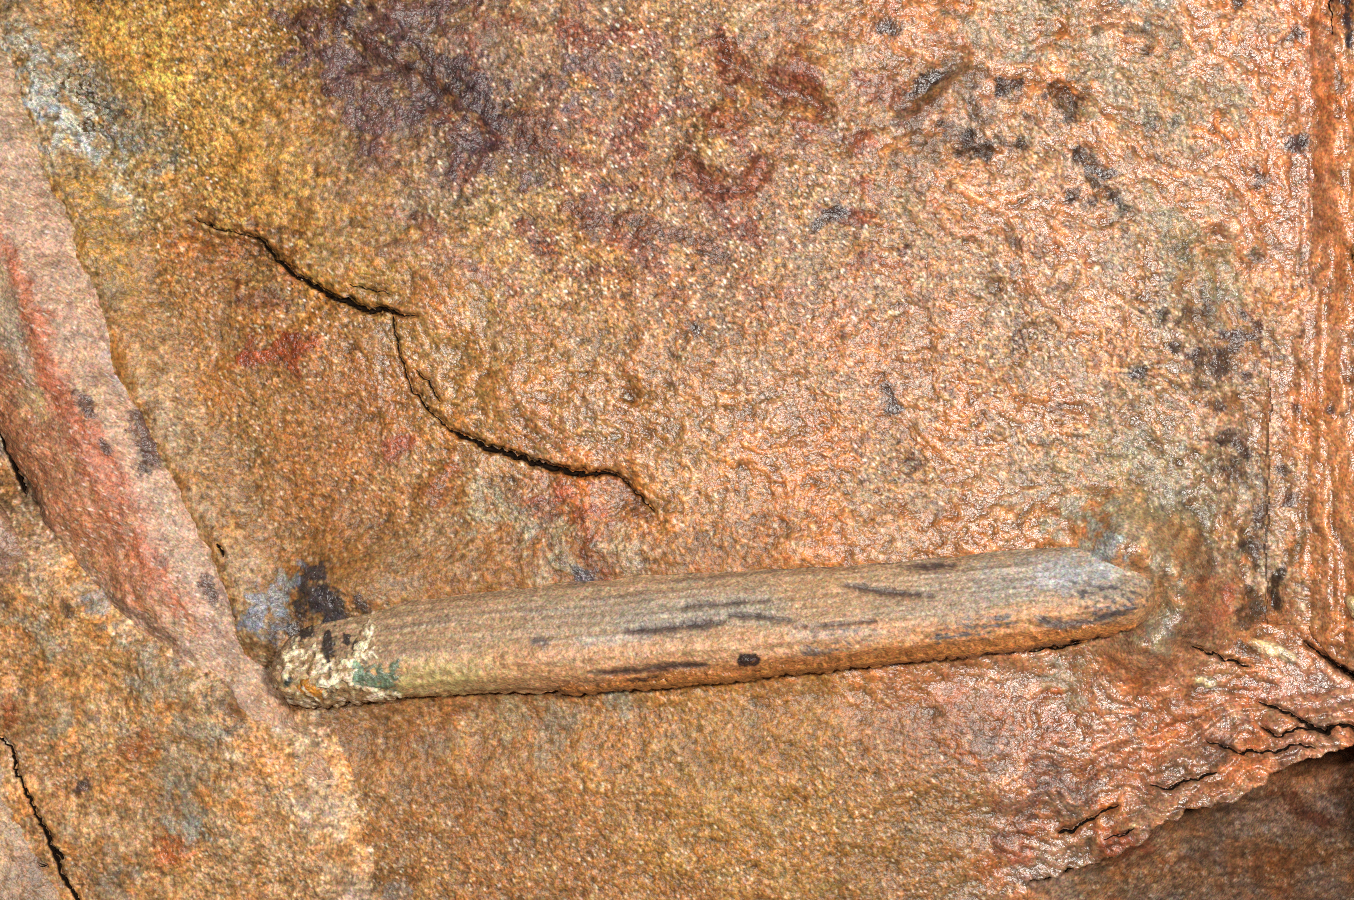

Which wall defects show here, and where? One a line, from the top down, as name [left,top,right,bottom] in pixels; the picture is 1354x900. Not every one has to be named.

crack [195,218,655,512]
peeling [1344,595,1354,618]
peeling [1249,638,1298,663]
peeling [1195,675,1217,689]
crack [0,737,80,900]